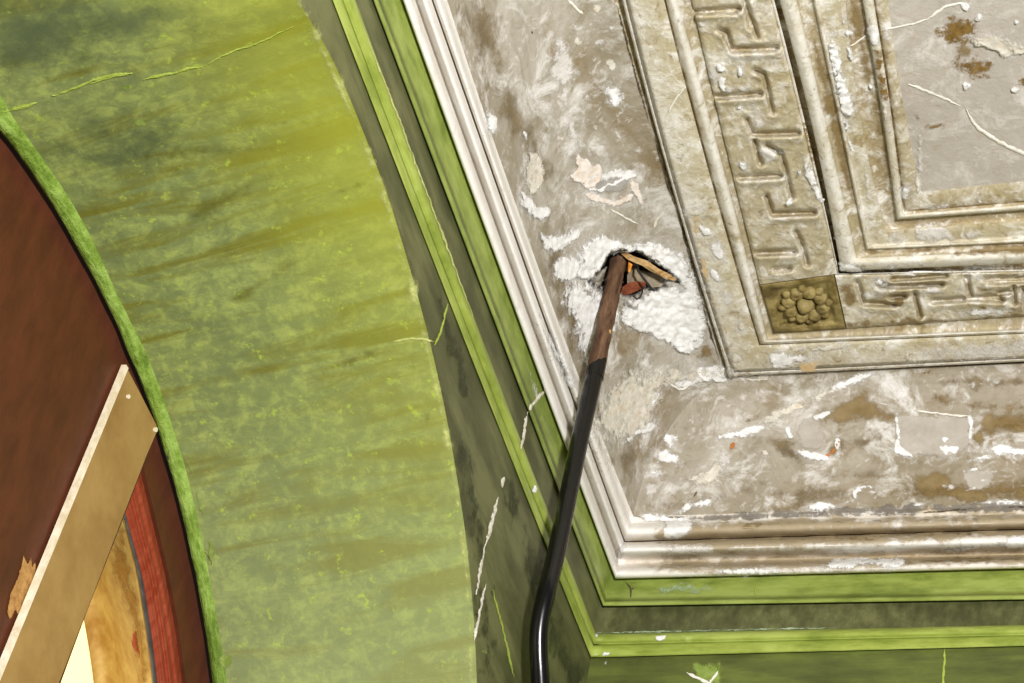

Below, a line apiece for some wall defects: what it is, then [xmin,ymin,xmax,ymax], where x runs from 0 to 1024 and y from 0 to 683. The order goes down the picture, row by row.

water stain [476,8,497,55]
crack [850,2,970,46]
crack [5,26,293,112]
crack [908,84,1024,155]
peeling [516,130,589,282]
flaking render [565,155,644,218]
water stain [552,280,579,327]
peeling [545,327,577,399]
water stain [827,393,894,423]
peeling [894,417,913,457]
peeling [940,437,959,455]
water stain [655,406,1024,575]